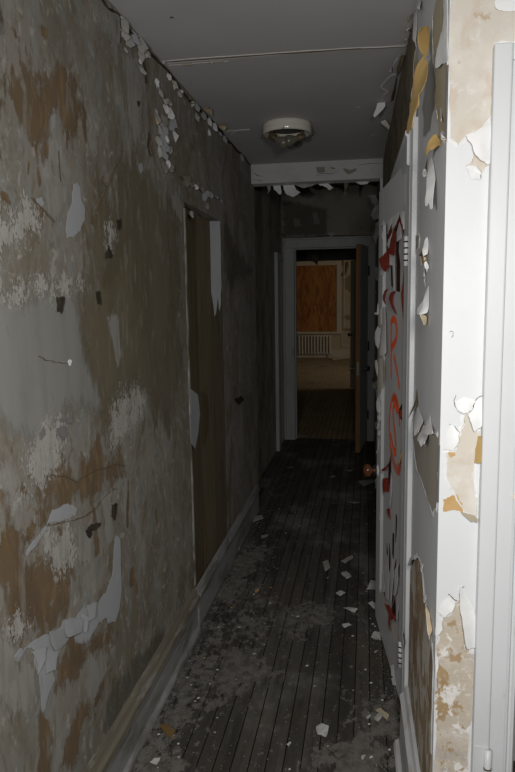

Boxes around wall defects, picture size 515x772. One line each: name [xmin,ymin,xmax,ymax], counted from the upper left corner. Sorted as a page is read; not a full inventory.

peeling [120,16,151,75]
peeling [154,73,227,174]
peeling [373,0,515,209]
peeling [267,184,333,197]
peeling [417,286,429,325]
peeling [398,390,482,523]
damp [35,514,79,583]
damp [1,607,36,645]
peeling [14,603,96,674]
spalling [366,447,475,772]